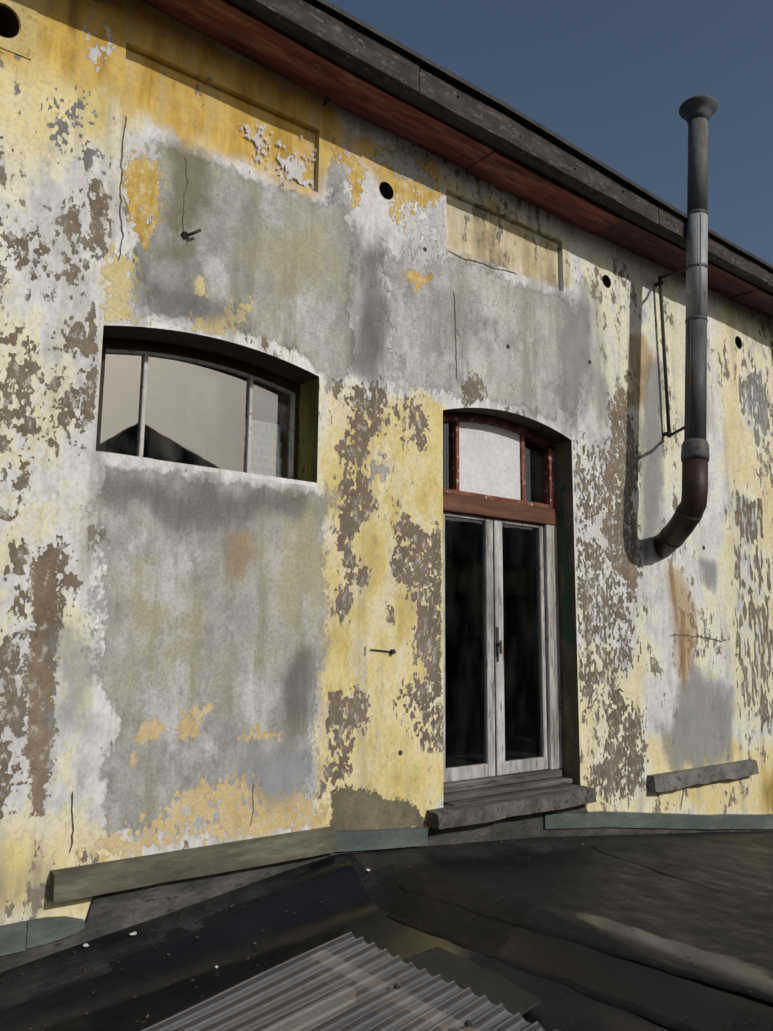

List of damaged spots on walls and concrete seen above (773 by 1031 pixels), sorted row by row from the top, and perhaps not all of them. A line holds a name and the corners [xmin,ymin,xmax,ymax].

damp [168,145,206,228]
peeling [241,120,317,188]
spalling [327,156,354,211]
damp [355,254,383,378]
peeling [0,75,119,820]
peeling [735,366,770,447]
peeling [330,375,443,753]
peeling [571,384,652,805]
peeling [730,489,773,732]
peeling [301,684,371,800]